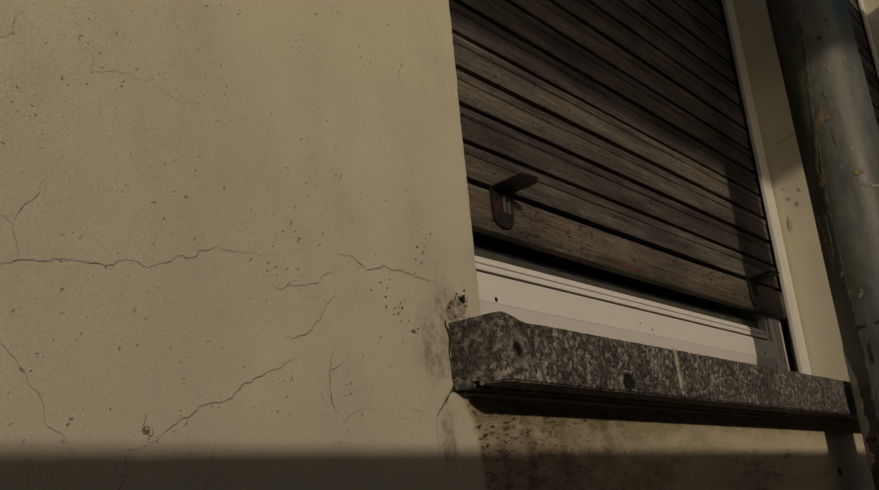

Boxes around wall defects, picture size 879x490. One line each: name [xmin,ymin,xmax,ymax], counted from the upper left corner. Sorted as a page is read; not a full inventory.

crack [0,189,275,268]
crack [0,246,466,489]
spalling [446,289,471,322]
peeling [842,347,876,472]